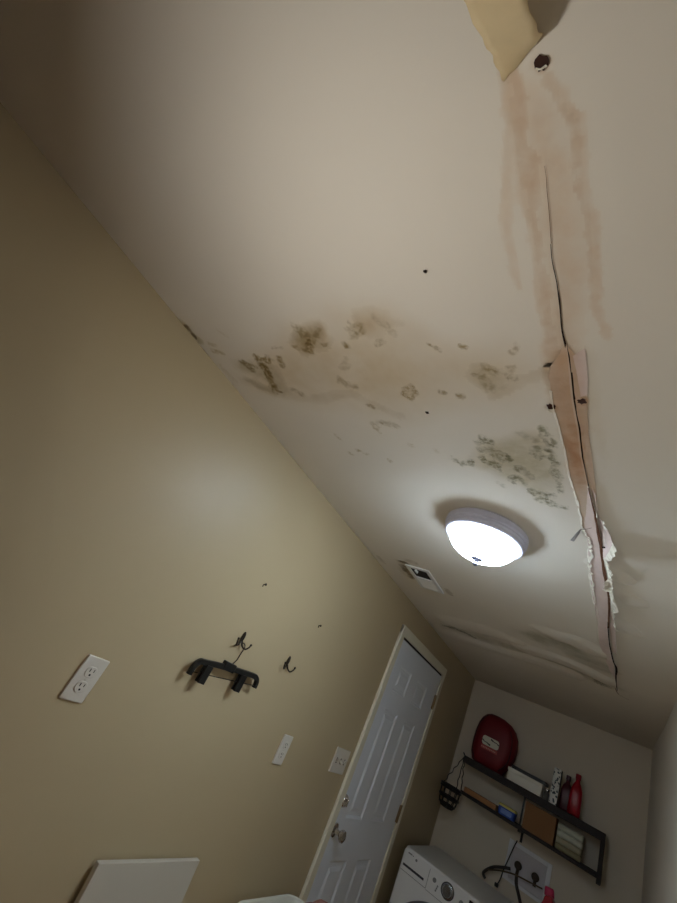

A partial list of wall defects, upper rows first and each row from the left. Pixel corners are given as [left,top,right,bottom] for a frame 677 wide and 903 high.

crack [544,166,621,696]
peeling [549,390,620,642]